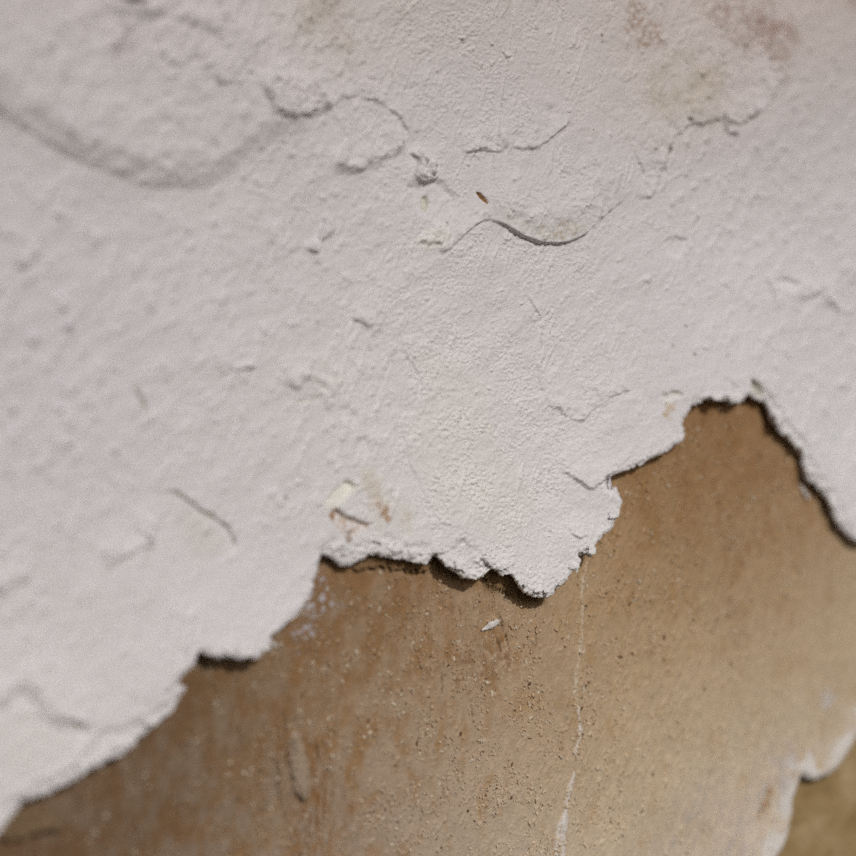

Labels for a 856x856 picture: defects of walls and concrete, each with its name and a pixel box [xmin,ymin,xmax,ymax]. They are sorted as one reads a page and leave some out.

peeling [773,413,806,452]
spalling [161,490,239,569]
spalling [323,479,374,551]
peeling [799,469,850,524]
peeling [442,554,469,572]
peeling [514,578,551,593]
peeling [224,642,271,658]
peeling [0,804,63,842]